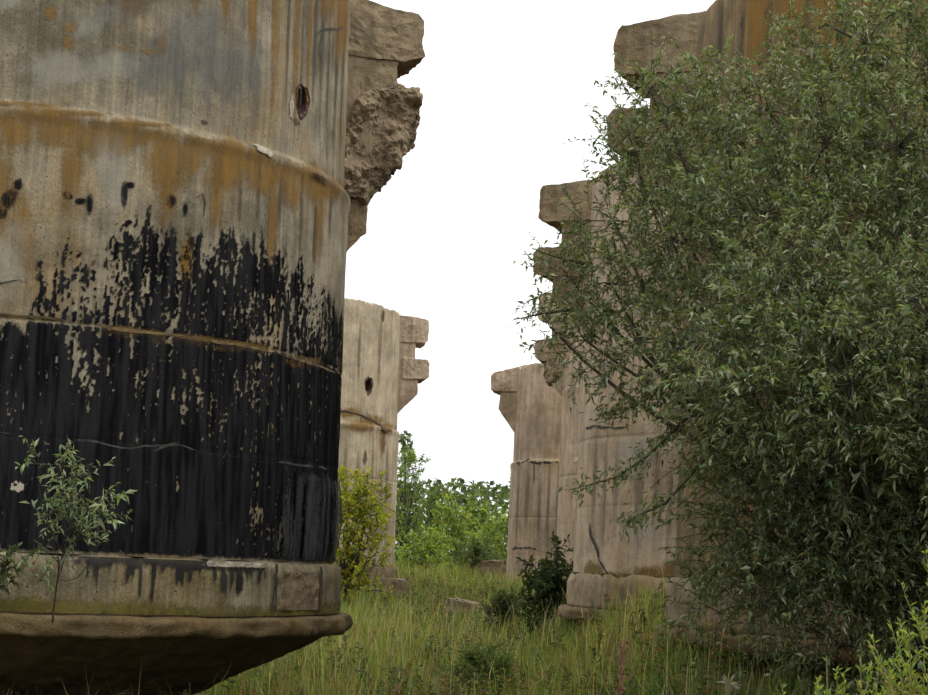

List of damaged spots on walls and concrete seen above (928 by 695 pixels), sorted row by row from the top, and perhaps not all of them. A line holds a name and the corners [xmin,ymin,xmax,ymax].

spalling [290,94,300,126]
rust [0,105,344,266]
spalling [10,480,24,492]
spalling [203,560,320,610]